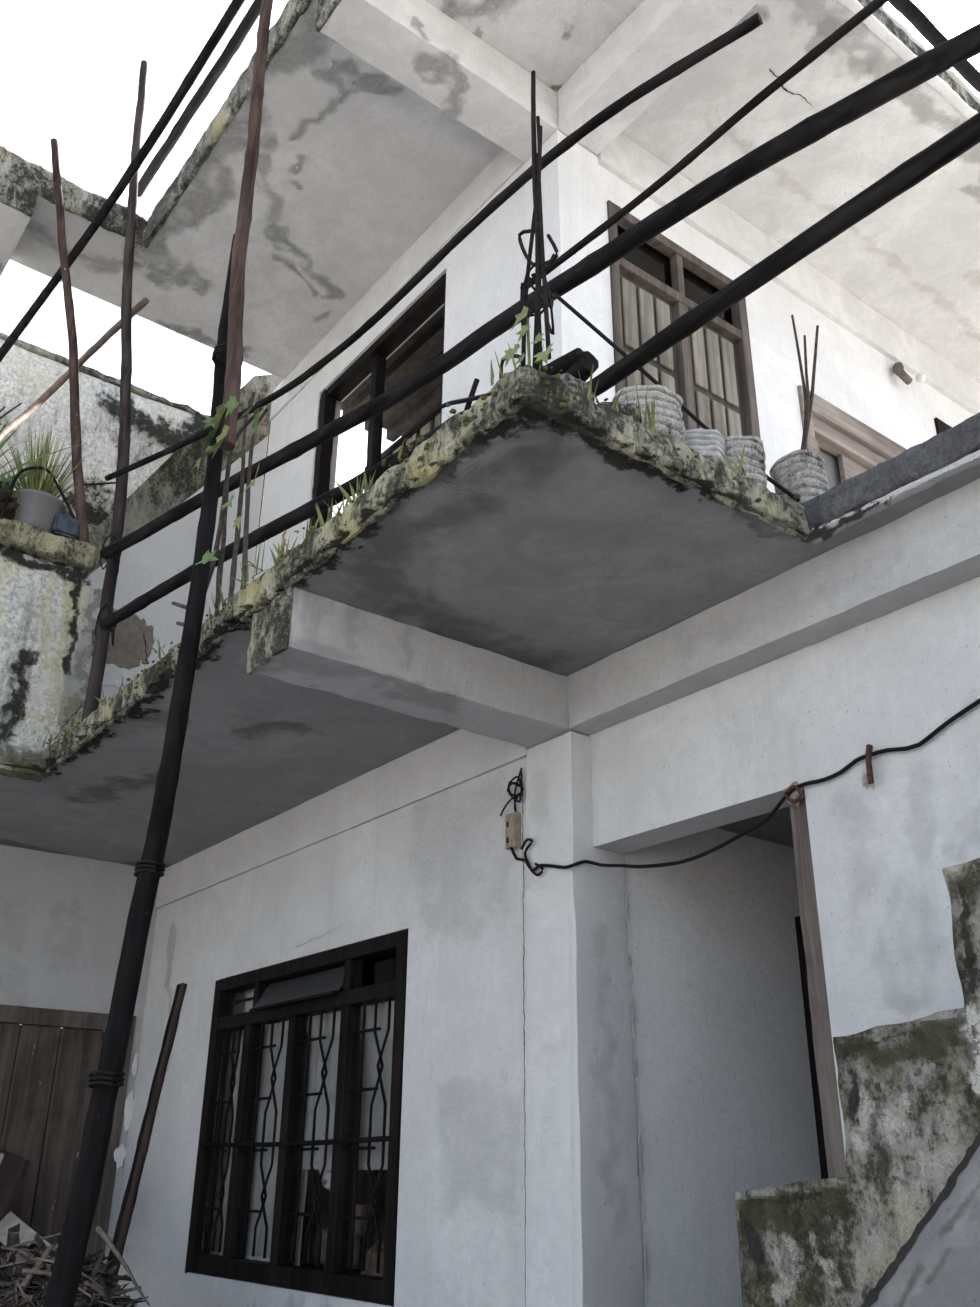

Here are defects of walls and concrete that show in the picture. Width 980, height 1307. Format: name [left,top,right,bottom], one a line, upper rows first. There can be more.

crack [769,69,810,104]
leakage [96,385,206,454]
leakage [62,477,115,540]
mould [195,397,892,670]
leakage [0,543,173,776]
peeling [88,608,155,688]
leakage [959,888,978,992]
mould [840,1032,905,1127]
leakage [959,1008,980,1093]
mould [739,1190,821,1283]